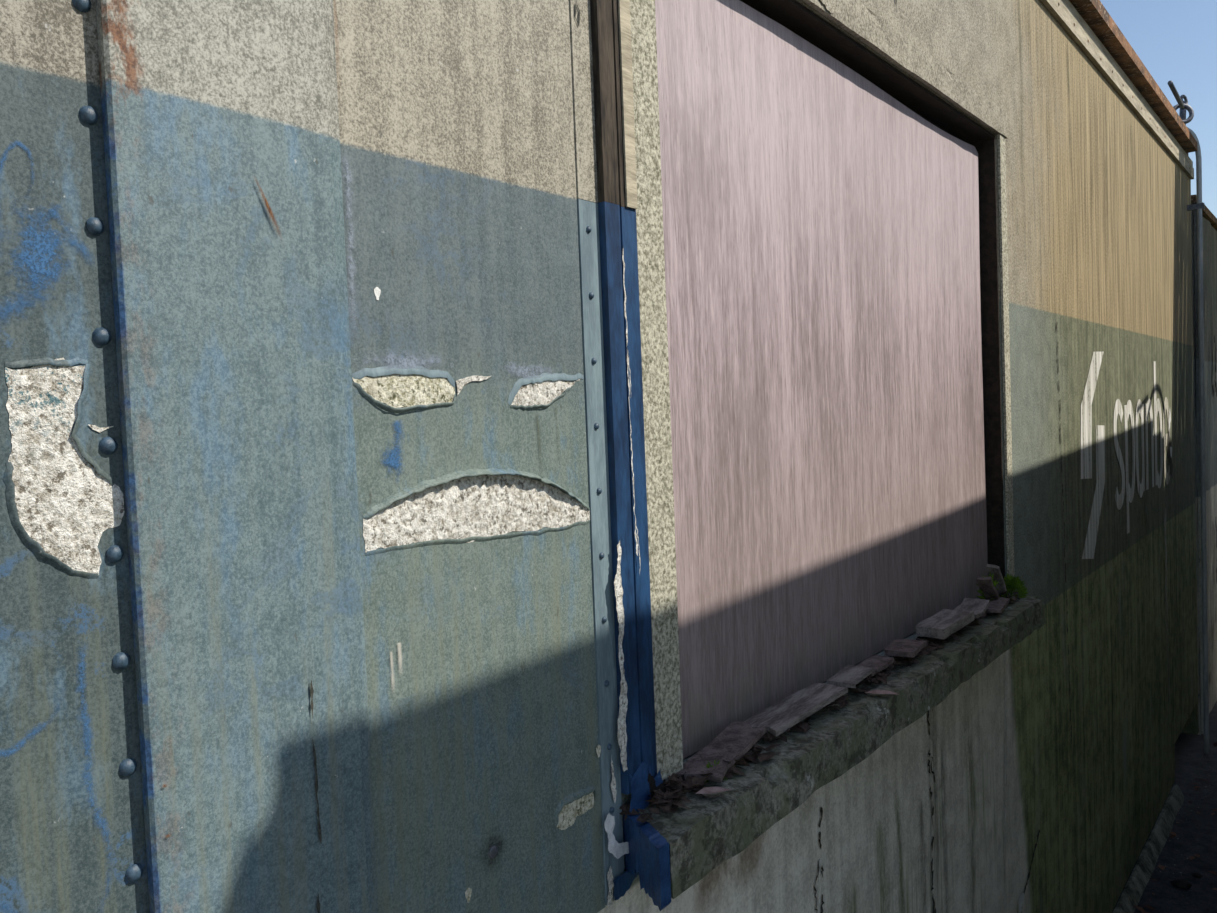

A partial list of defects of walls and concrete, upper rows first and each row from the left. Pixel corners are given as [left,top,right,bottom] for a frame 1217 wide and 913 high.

peeling [3,357,125,578]
peeling [352,354,491,414]
peeling [363,468,590,556]
peeling [508,365,584,411]
peeling [553,541,686,907]
crack [927,710,936,913]